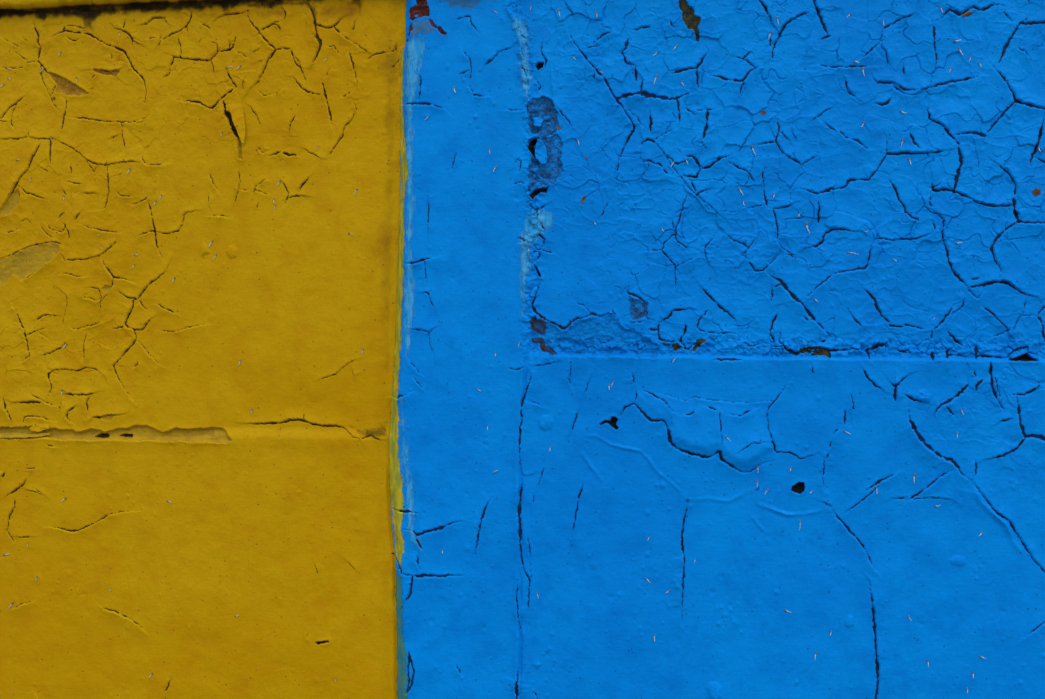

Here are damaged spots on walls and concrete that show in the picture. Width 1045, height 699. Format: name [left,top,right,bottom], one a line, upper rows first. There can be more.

peeling [527,96,564,193]
crack [0,3,442,422]
peeling [0,242,59,285]
crack [532,0,1045,573]
peeling [0,415,232,443]
crack [251,415,381,441]
crack [510,362,591,629]
crack [392,502,489,600]
crack [680,509,688,612]
crack [406,653,415,693]
crack [515,673,538,699]
crack [870,590,879,699]